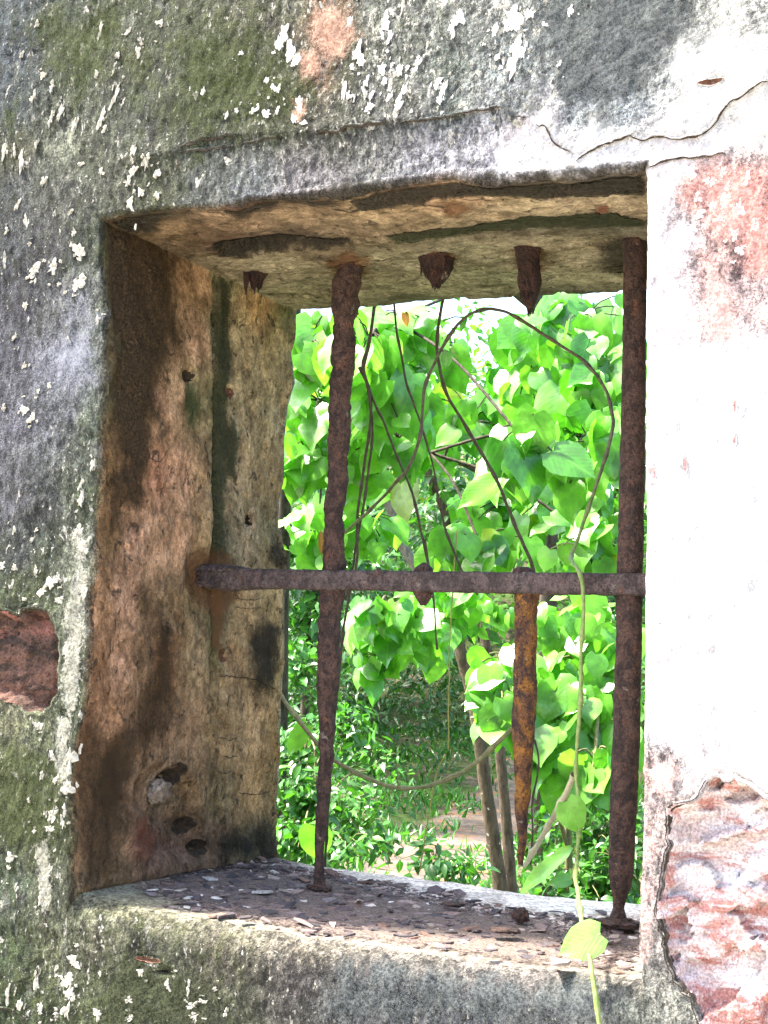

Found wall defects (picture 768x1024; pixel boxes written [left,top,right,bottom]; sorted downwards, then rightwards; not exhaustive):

crack [317,79,768,168]
corrosion [598,239,624,274]
peeling [1,382,55,429]
leakage [107,201,332,543]
peeling [72,454,97,600]
corrosion [185,551,236,648]
flaking render [0,562,83,836]
mould [250,618,282,694]
peeling [34,848,56,908]
flaking render [640,759,768,1024]